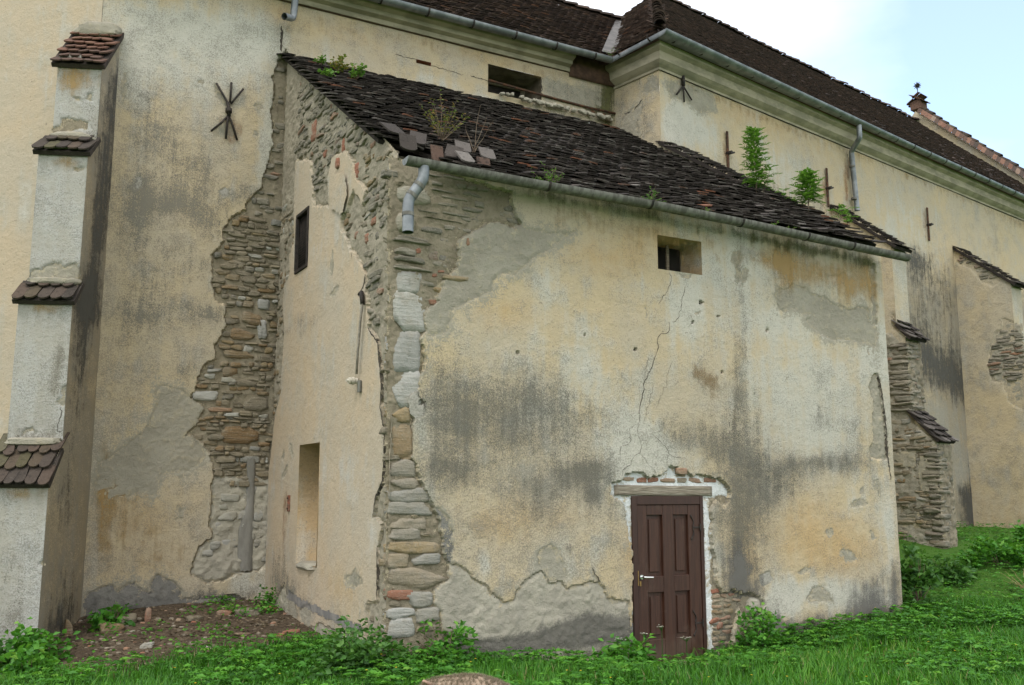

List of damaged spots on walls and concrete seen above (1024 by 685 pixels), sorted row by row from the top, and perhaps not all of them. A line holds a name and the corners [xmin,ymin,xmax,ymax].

water stain [907,247,951,304]
peeling [93,385,206,499]
spalling [273,64,632,660]
water stain [417,365,616,518]
crack [620,275,686,475]
water stain [662,266,864,603]
spalling [774,265,958,549]
water stain [910,309,964,401]
spalling [987,321,1024,410]
water stain [749,567,902,638]